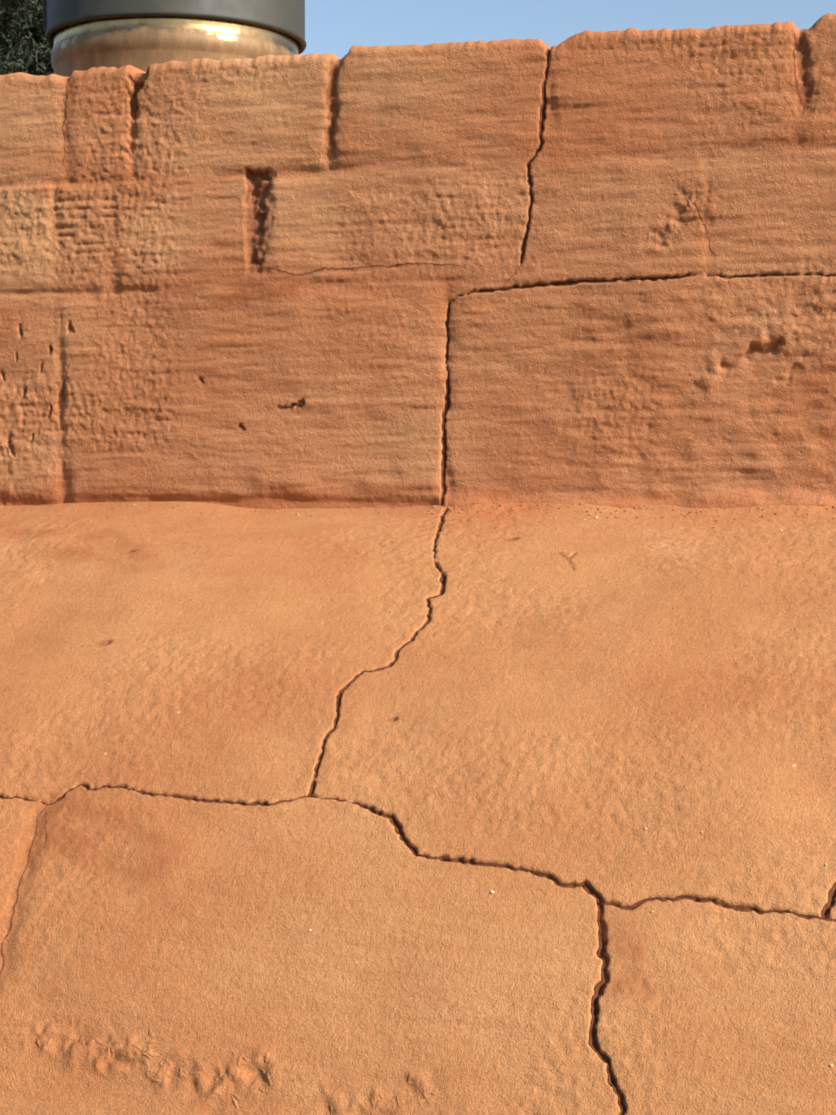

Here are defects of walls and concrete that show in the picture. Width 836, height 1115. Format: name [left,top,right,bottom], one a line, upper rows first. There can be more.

crack [793,32,806,117]
crack [269,262,459,276]
crack [441,49,697,506]
crack [707,272,836,280]
crack [0,510,836,1115]